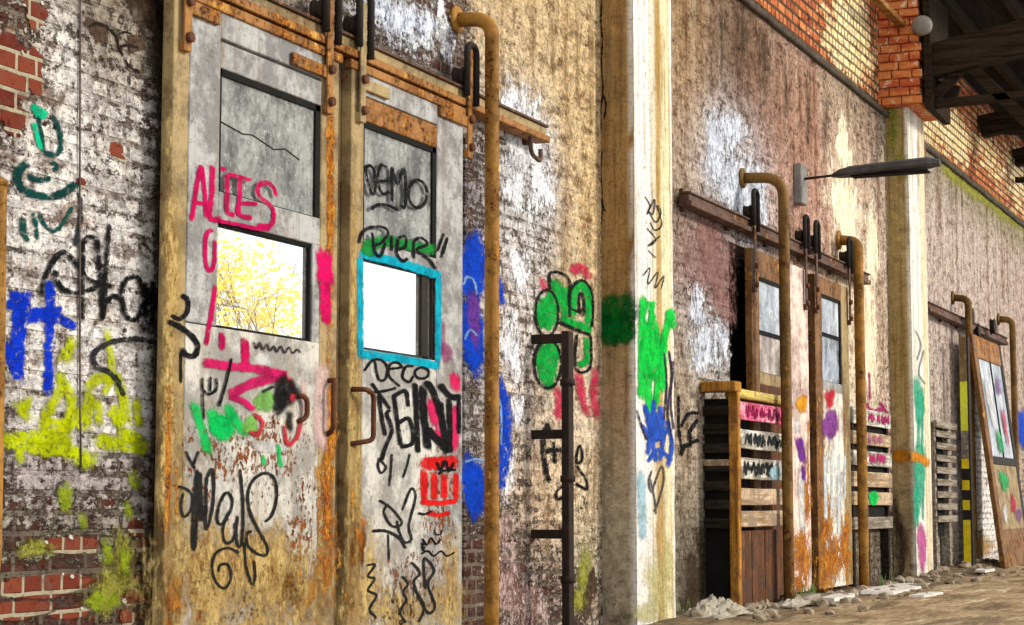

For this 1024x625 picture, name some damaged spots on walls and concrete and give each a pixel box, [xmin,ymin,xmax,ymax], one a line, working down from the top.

peeling [22,0,49,29]
peeling [0,24,43,138]
corrosion [146,107,477,625]
spalling [499,237,558,625]
corrosion [794,411,853,594]
peeling [43,535,98,555]
peeling [127,517,149,553]
peeling [0,572,99,621]
peeling [120,589,146,625]